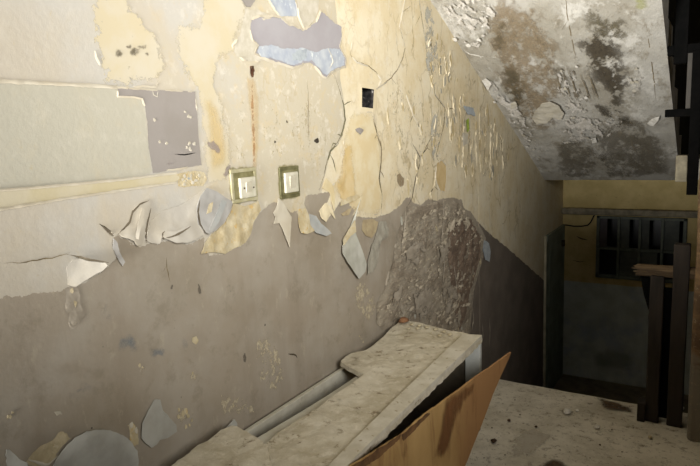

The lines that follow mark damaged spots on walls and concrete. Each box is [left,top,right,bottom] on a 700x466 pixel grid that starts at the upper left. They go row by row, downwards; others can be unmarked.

crack [9,253,69,263]
peeling [66,255,109,287]
peeling [92,0,347,266]
peeling [273,81,389,279]
crack [319,73,351,190]
crack [350,0,453,210]
peeling [425,7,458,93]
peeling [443,0,495,54]
flaking render [376,70,622,334]
leakage [491,6,555,127]
leakage [580,12,630,124]
peeling [5,399,194,466]